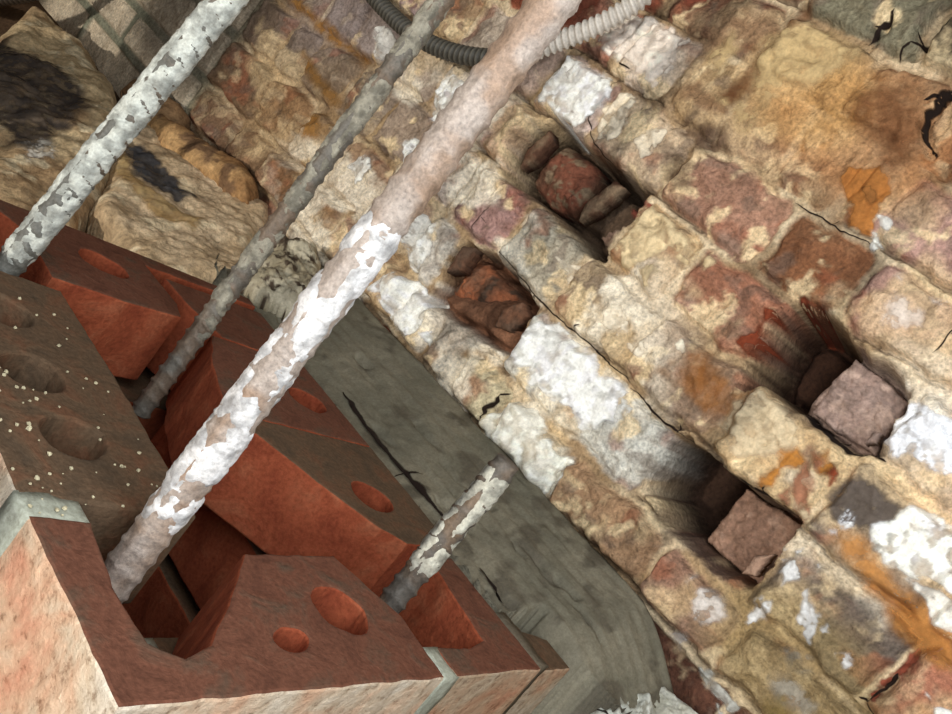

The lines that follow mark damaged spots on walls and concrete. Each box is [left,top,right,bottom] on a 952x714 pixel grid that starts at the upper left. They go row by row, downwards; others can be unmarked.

crack [868,8,929,61]
crack [921,89,952,158]
corrosion [841,89,920,236]
crack [796,203,875,251]
corrosion [760,448,804,488]
corrosion [817,455,834,474]
corrosion [843,540,952,666]